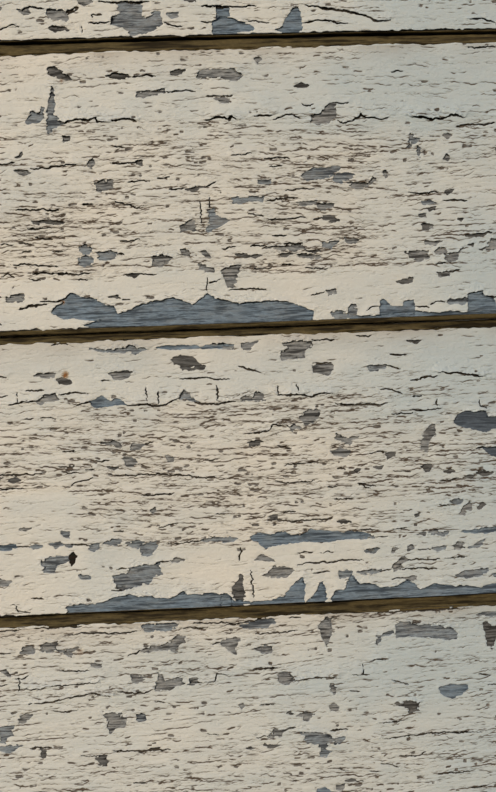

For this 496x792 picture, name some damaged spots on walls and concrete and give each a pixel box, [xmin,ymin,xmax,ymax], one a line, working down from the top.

peeling [16,0,179,36]
peeling [25,66,73,143]
peeling [404,199,496,278]
peeling [51,237,359,328]
peeling [330,286,496,319]
peeling [89,340,258,371]
crack [0,372,88,398]
peeling [0,367,266,408]
peeling [453,403,496,432]
peeling [0,514,496,613]
peeling [373,615,459,645]
peeling [246,711,349,758]